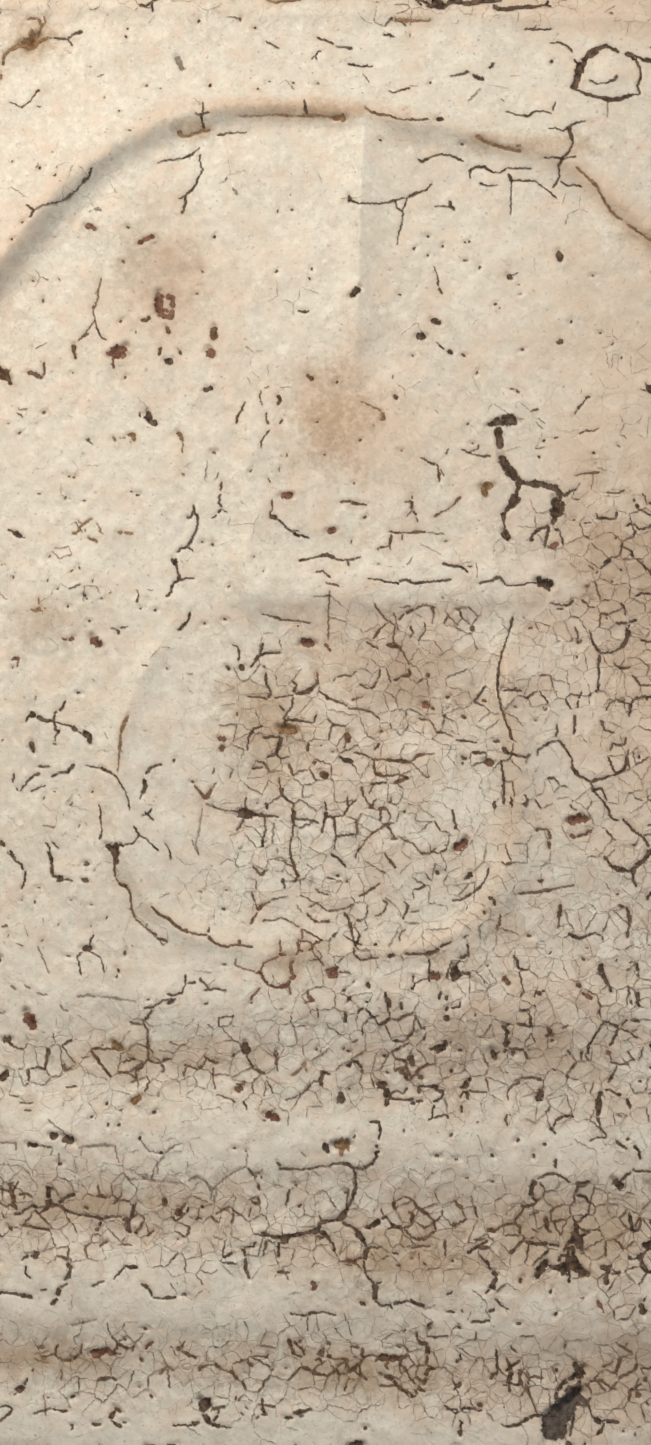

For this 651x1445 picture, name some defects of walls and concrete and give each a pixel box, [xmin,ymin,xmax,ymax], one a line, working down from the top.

crack [53,7,98,46]
crack [625,51,651,63]
crack [10,89,41,108]
crack [12,165,115,217]
crack [36,278,106,359]
spalling [541,1361,587,1441]